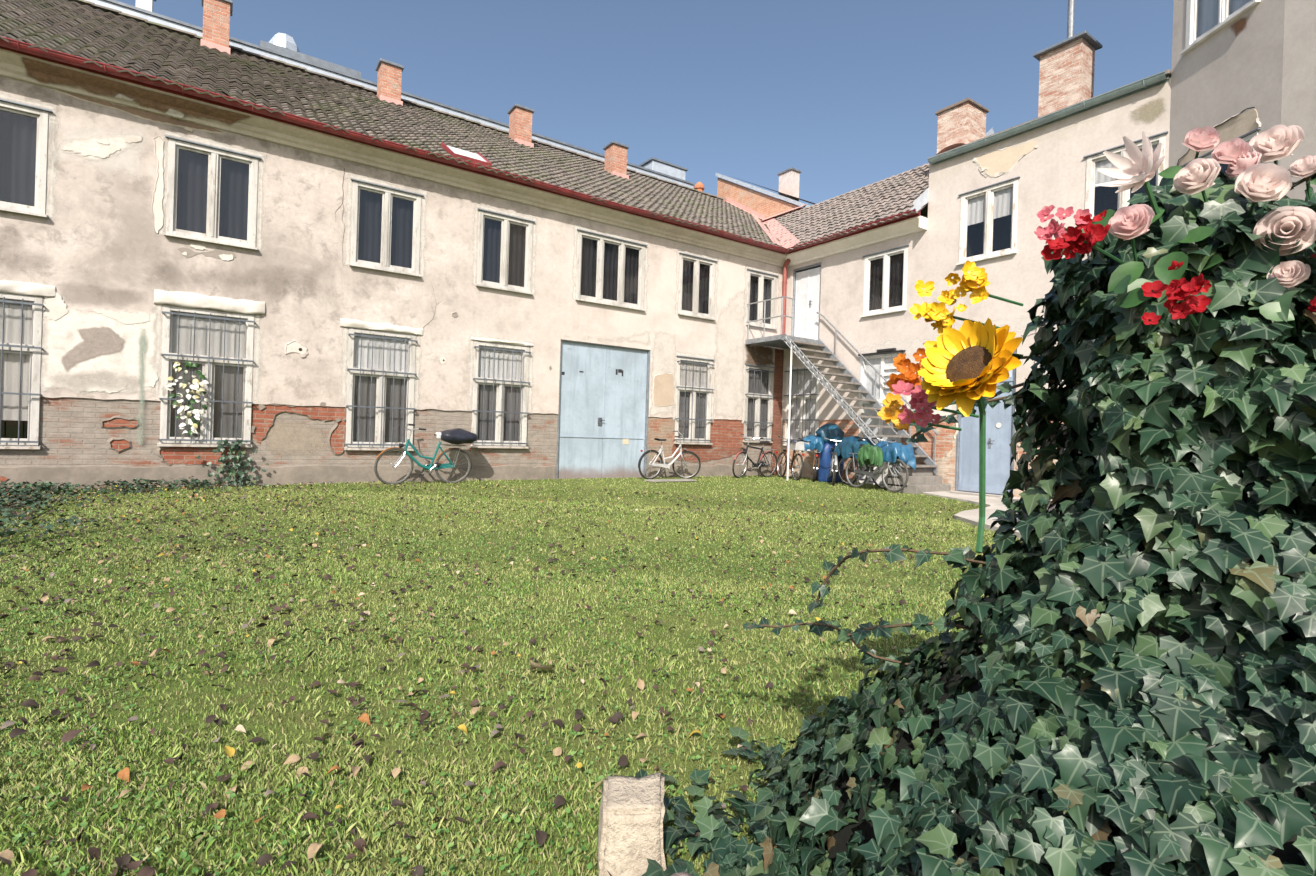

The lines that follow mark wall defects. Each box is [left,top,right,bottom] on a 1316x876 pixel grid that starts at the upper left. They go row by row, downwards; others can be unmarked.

flaking render [973,140,1038,178]
flaking render [1177,107,1261,166]
flaking render [62,309,150,370]
flaking render [100,415,142,454]
flaking render [156,446,242,466]
flaking render [251,402,347,456]